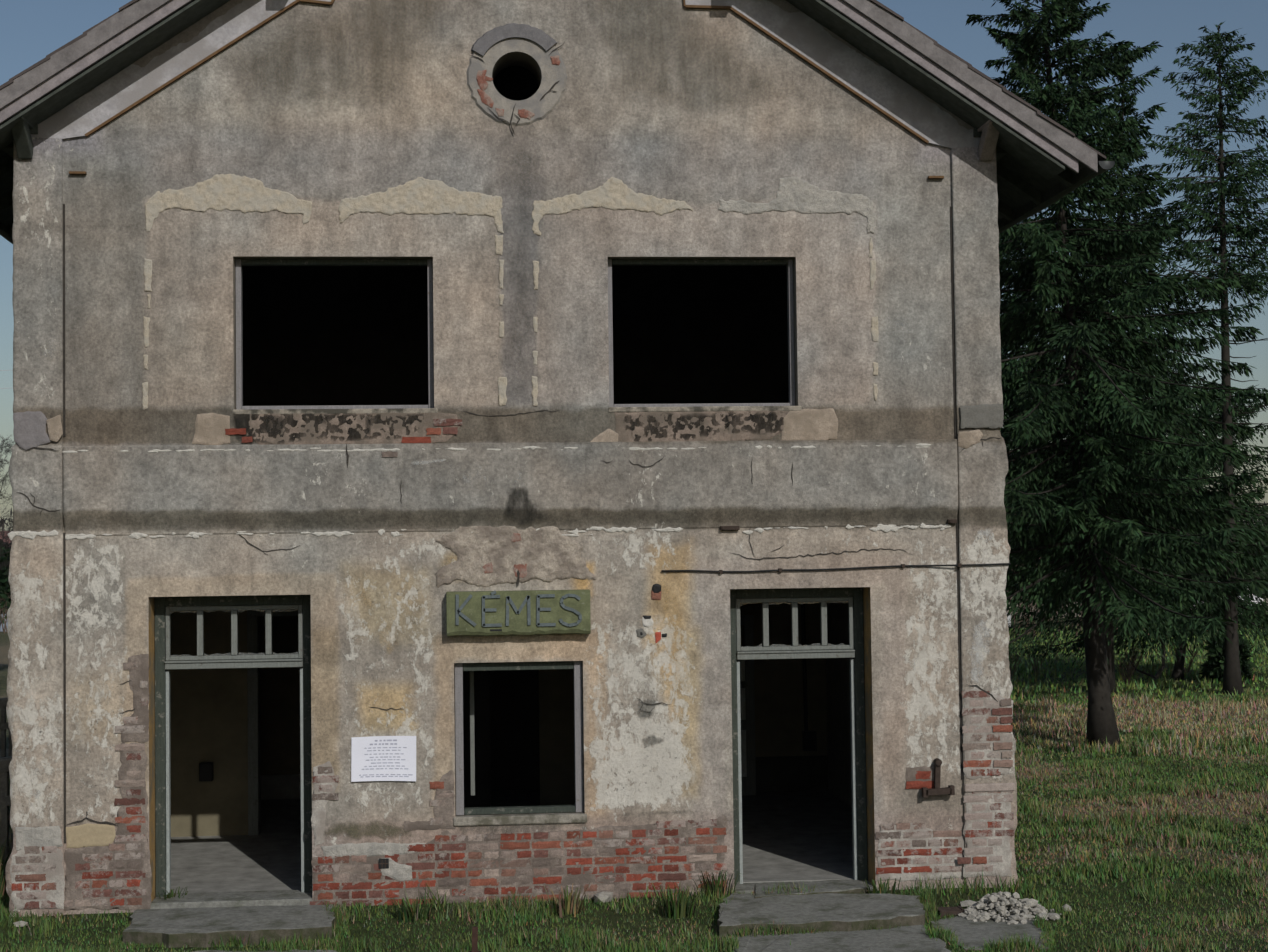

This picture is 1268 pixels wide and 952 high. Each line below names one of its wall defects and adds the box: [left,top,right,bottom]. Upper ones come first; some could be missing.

spalling [145,174,312,232]
spalling [532,177,693,236]
peeling [148,412,466,457]
peeling [560,408,838,451]
peeling [435,525,637,588]
crack [732,527,913,560]
peeling [845,523,951,532]
spalling [651,584,662,600]
spalling [636,615,667,643]
flaking render [875,622,1014,882]
flaking render [10,654,152,911]
flaking render [310,761,728,907]